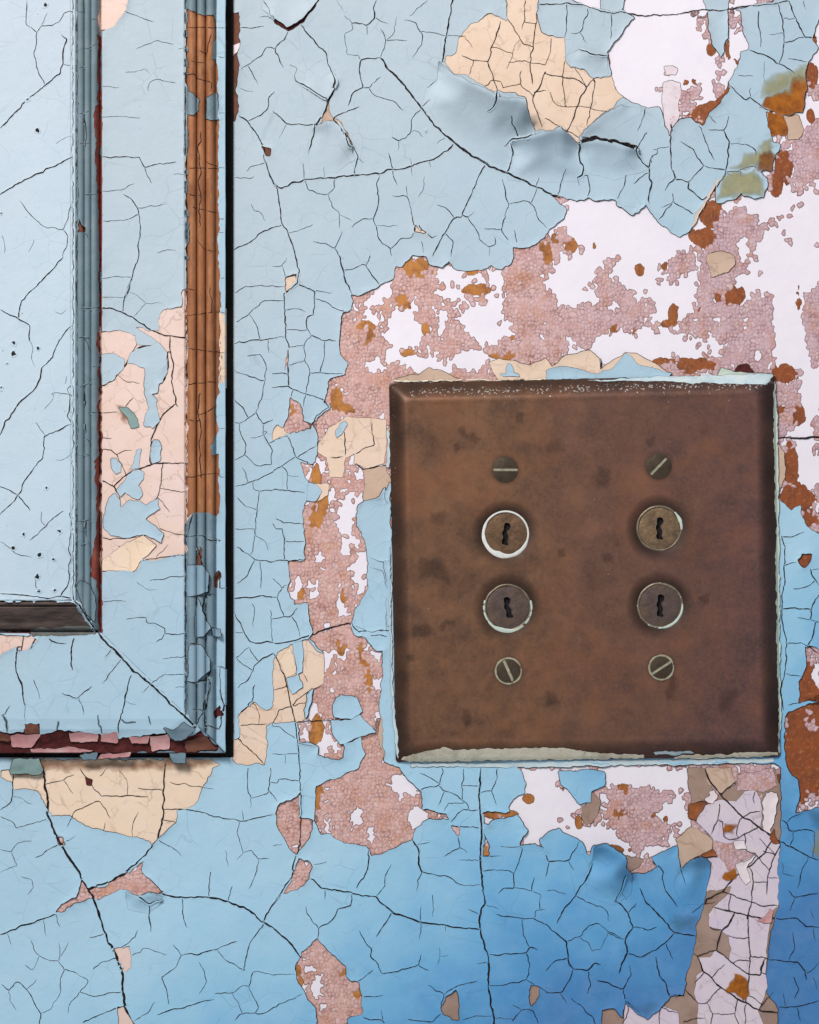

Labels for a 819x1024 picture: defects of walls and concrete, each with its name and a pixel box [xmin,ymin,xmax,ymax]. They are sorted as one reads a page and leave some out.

crack [463,0,758,220]
rust [758,153,775,171]
crack [727,0,812,112]
rust [761,76,807,136]
peeling [0,0,240,718]
crack [0,0,567,1024]
peeling [232,23,819,1024]
crack [778,433,819,441]
crack [780,531,819,710]
peeling [0,722,223,845]
crack [305,767,819,1024]